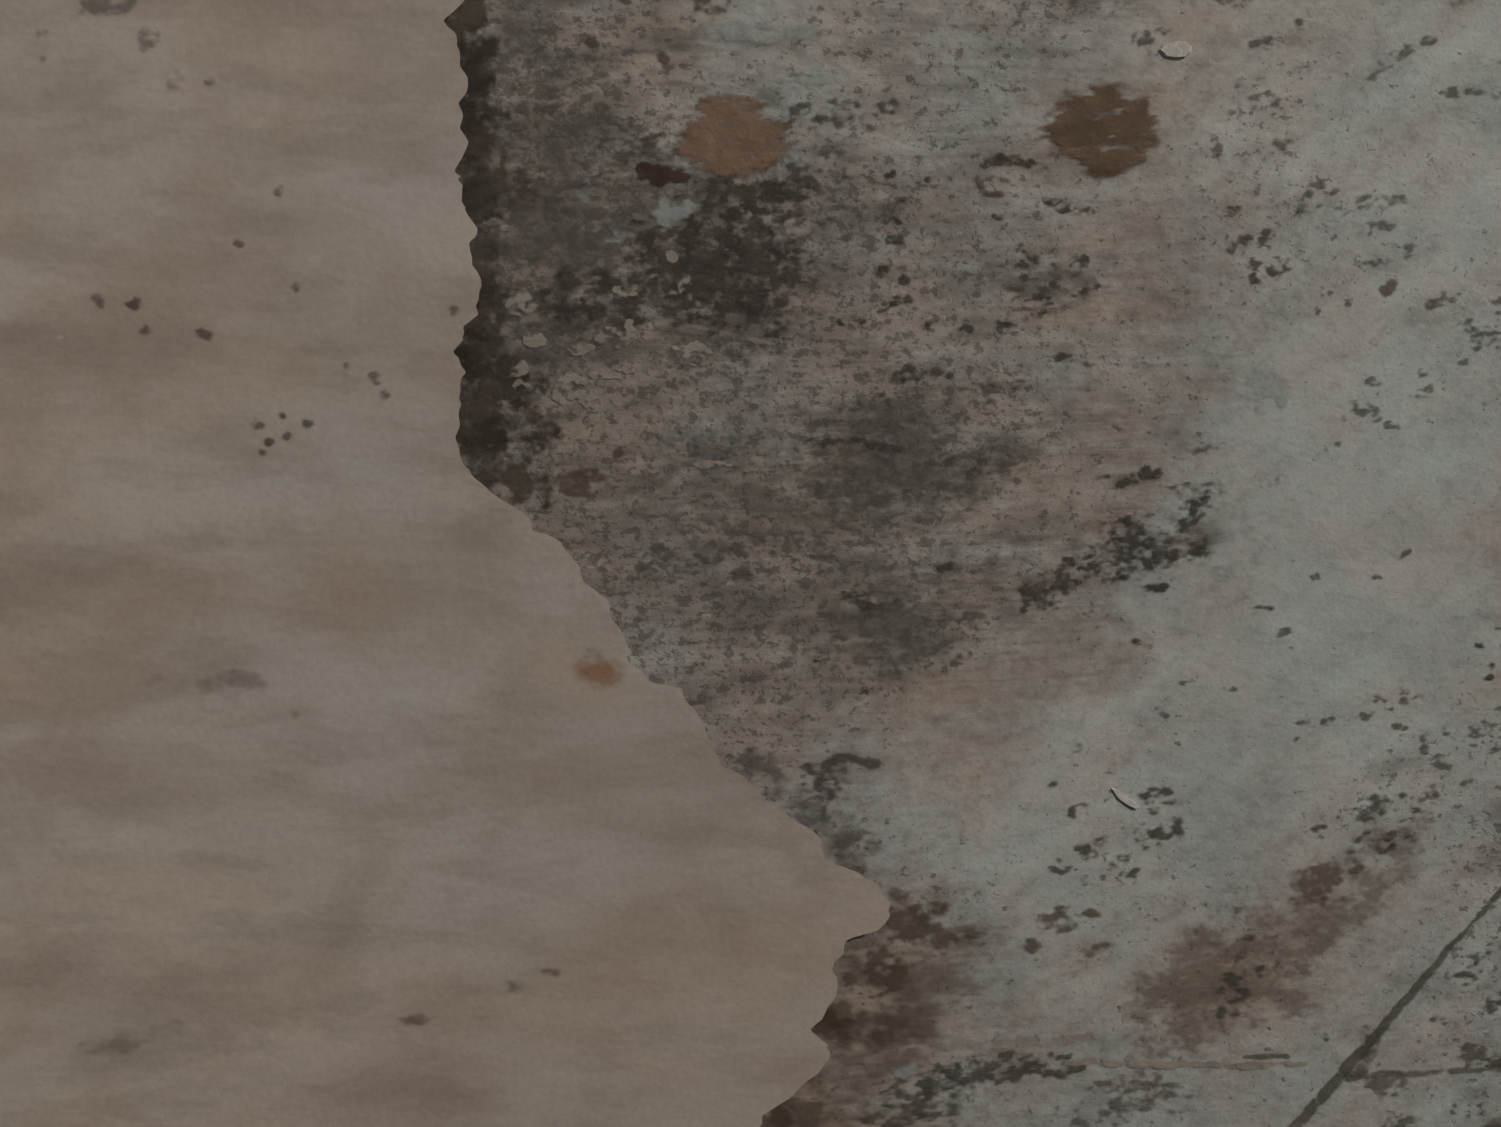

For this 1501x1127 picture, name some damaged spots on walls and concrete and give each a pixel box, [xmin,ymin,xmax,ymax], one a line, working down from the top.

rust [637,94,795,187]
mould [788,98,899,130]
rust [1041,84,1161,177]
water stain [445,0,849,508]
peeling [444,0,1501,1127]
water stain [763,888,1177,1127]
mould [1217,957,1265,1019]
crack [1289,888,1501,1127]
water stain [1367,1071,1406,1096]
water stain [1461,1043,1501,1067]